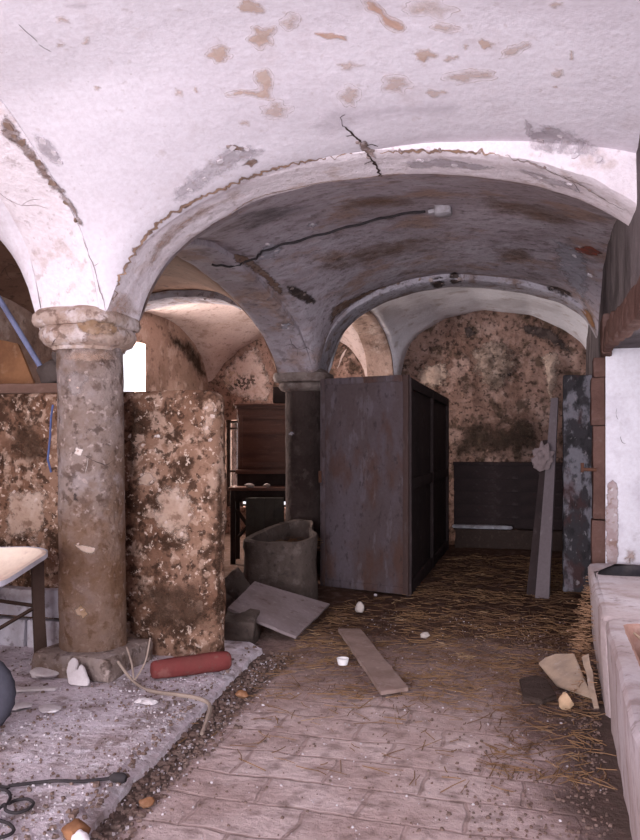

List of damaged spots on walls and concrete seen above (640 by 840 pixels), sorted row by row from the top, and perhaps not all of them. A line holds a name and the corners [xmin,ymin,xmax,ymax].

spalling [1,118,82,224]
crack [340,115,381,175]
peeling [112,144,352,304]
water stain [12,426,43,459]
water stain [130,404,143,472]
water stain [457,419,537,456]
peeling [605,480,619,564]